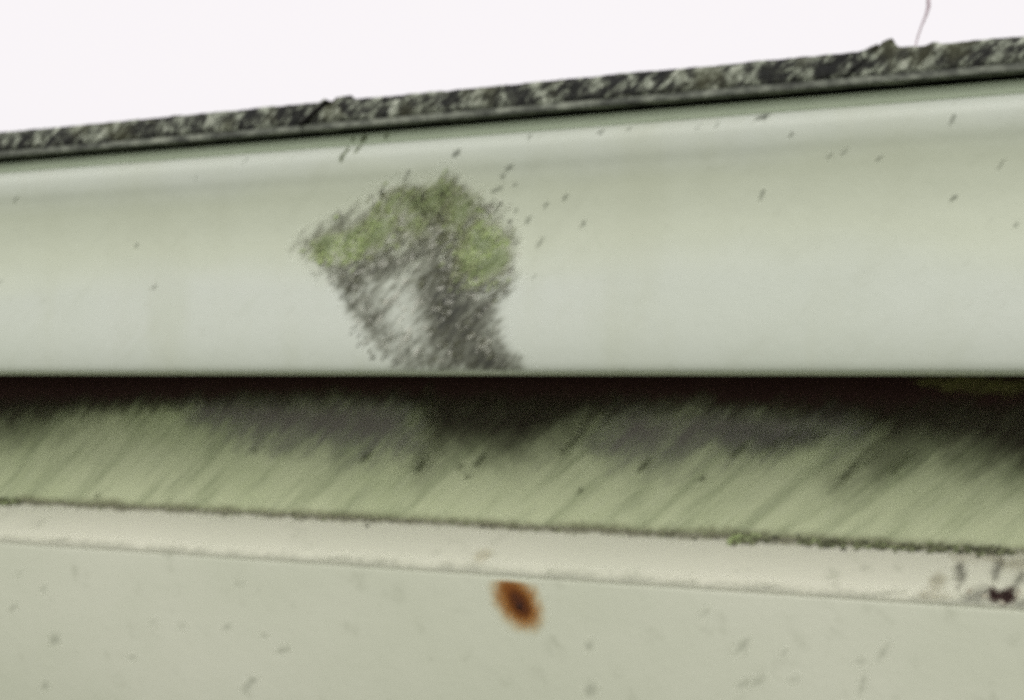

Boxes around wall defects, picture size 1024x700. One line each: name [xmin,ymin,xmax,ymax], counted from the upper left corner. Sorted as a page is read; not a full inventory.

damp [0,181,1024,466]
rust [496,581,539,627]